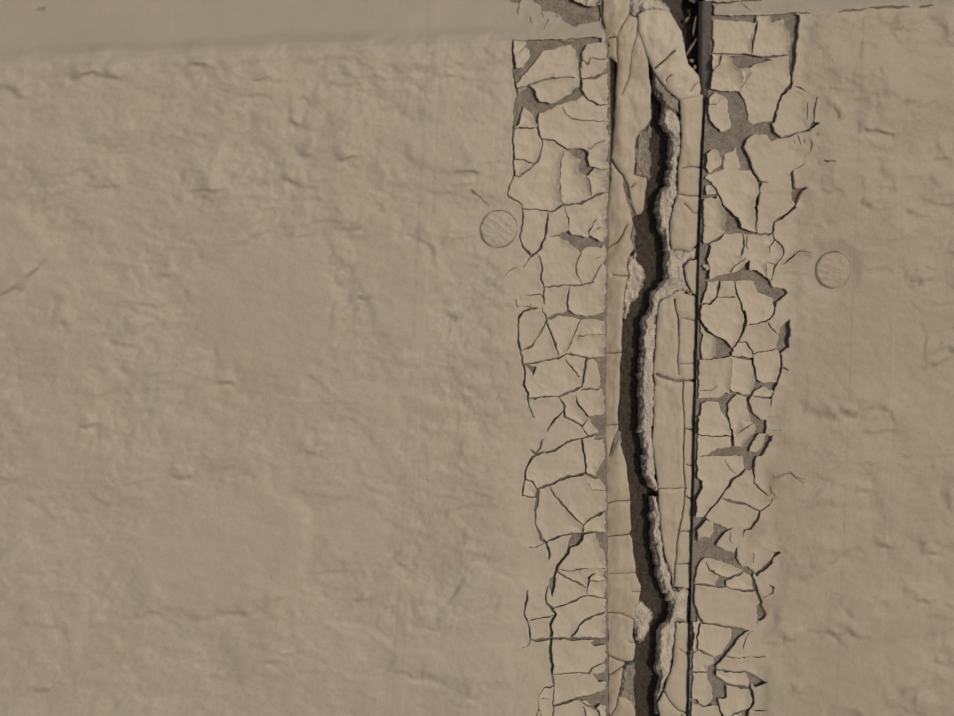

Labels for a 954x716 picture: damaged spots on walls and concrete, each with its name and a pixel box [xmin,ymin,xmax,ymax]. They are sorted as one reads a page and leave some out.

peeling [507,0,611,716]
crack [602,0,615,199]
crack [606,69,707,716]
peeling [686,0,816,716]